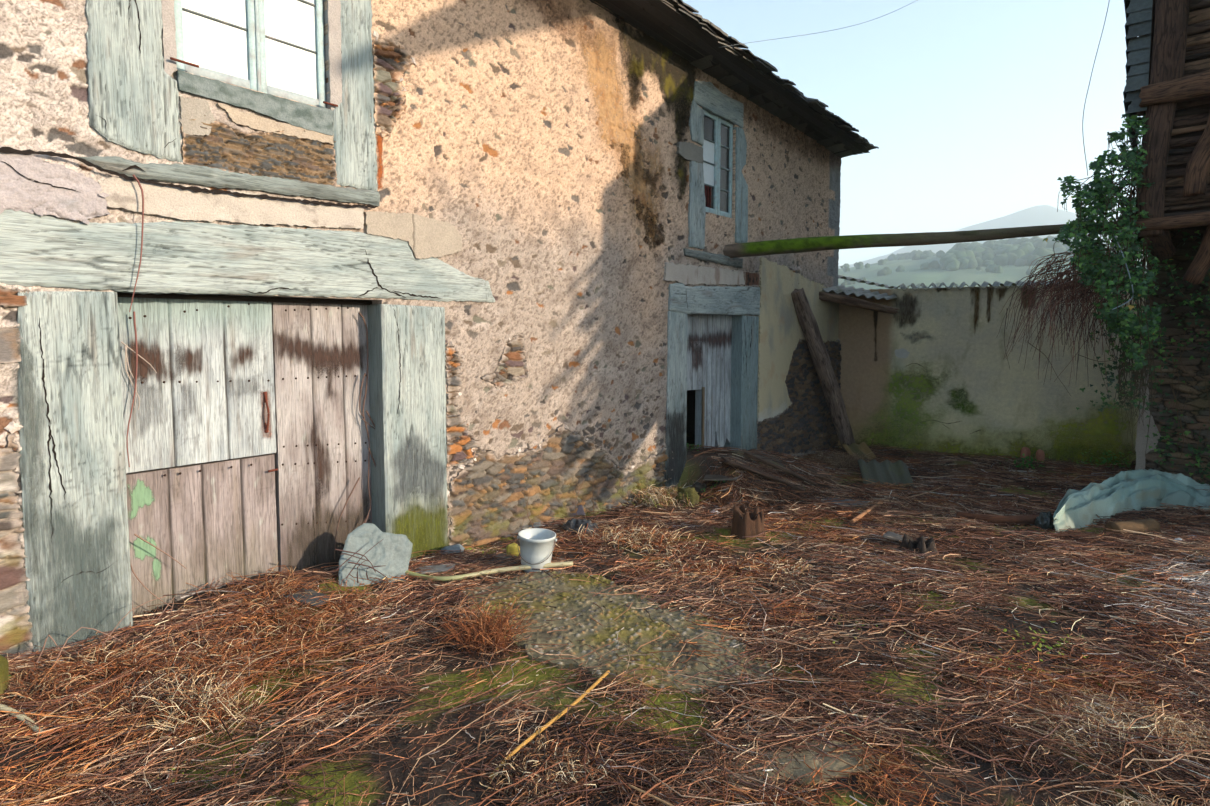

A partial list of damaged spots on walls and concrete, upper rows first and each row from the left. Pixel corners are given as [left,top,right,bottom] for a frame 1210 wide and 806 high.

flaking render [180,115,336,188]
flaking render [372,30,416,138]
damp [534,0,690,257]
flaking render [0,285,27,308]
damp [394,438,445,499]
flaking render [445,334,673,550]
flaking render [757,339,839,456]
flaking render [824,339,842,389]
flaking render [0,421,33,662]